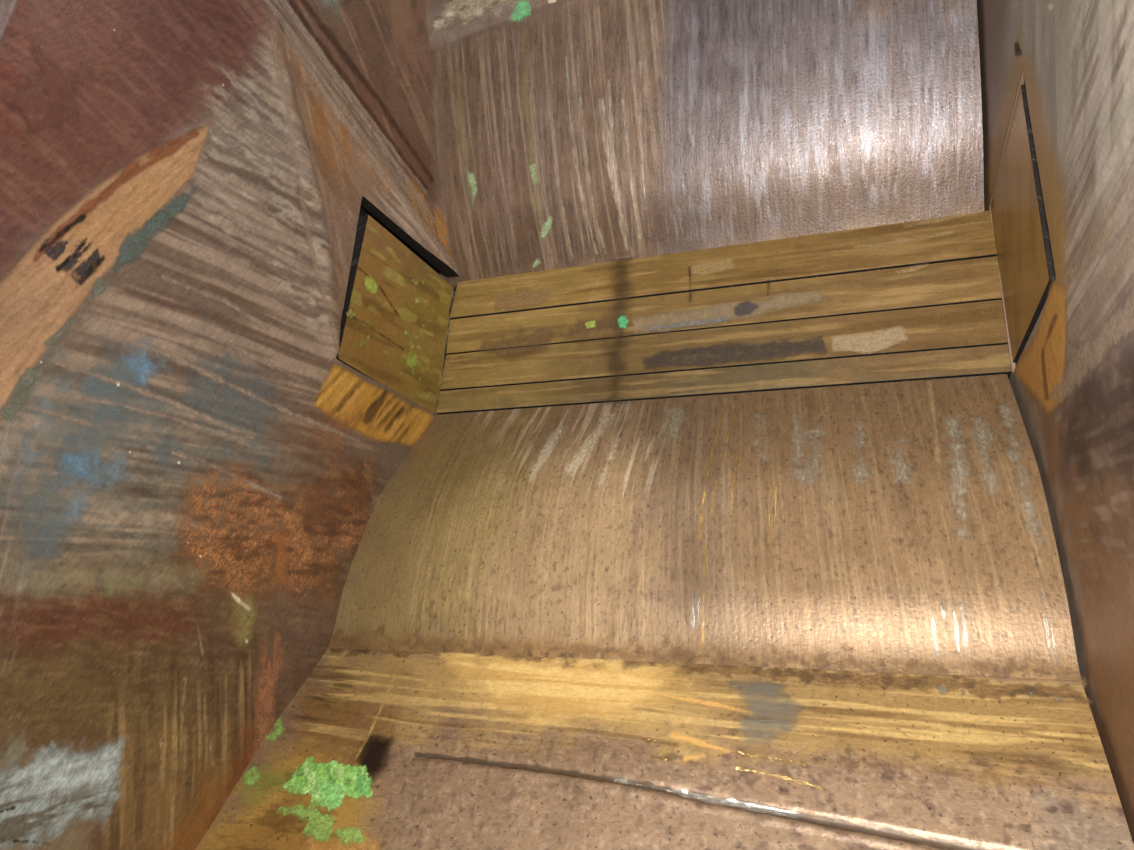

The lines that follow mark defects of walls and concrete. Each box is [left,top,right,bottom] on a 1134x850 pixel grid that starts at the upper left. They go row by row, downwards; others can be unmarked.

rust [178,364,434,600]
damp [736,751,821,788]